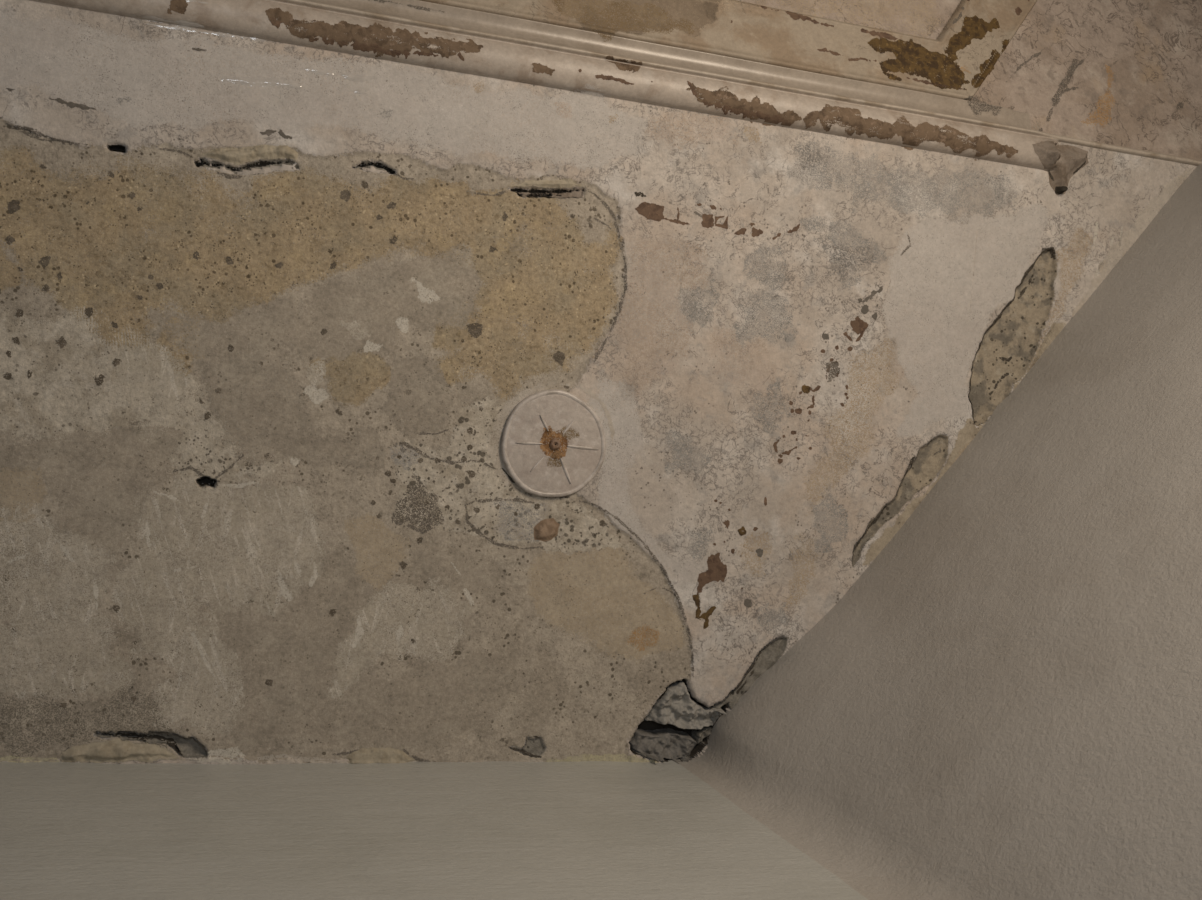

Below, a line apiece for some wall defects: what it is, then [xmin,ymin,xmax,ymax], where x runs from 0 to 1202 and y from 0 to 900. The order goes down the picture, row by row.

peeling [265,8,483,61]
peeling [761,6,834,27]
peeling [818,0,1009,90]
peeling [49,98,96,110]
peeling [686,81,1018,161]
crack [160,148,298,180]
crack [353,160,414,180]
flaking render [852,247,1066,567]
flaking render [0,118,800,764]
corrosion [540,425,580,467]